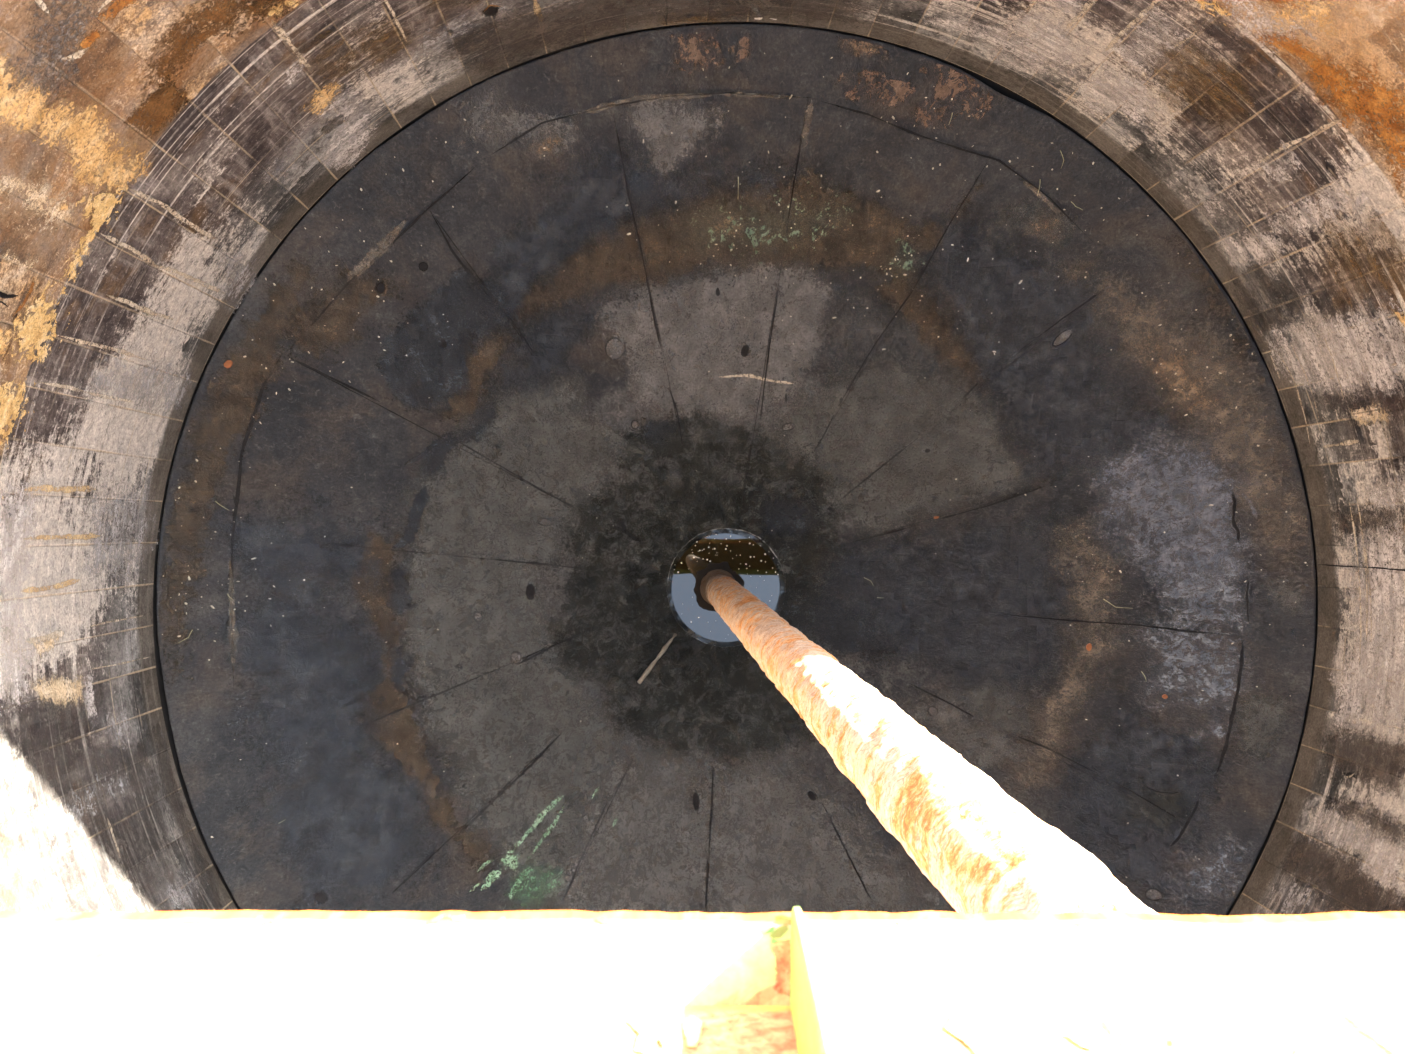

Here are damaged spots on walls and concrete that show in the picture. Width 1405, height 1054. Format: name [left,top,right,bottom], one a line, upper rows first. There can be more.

rust [61,0,136,61]
rust [123,0,298,139]
water stain [252,77,377,184]
rust [1154,0,1405,204]
water stain [1261,95,1318,186]
water stain [74,141,1405,932]
crack [1232,492,1257,543]
crack [909,577,1249,850]
water stain [760,924,788,938]